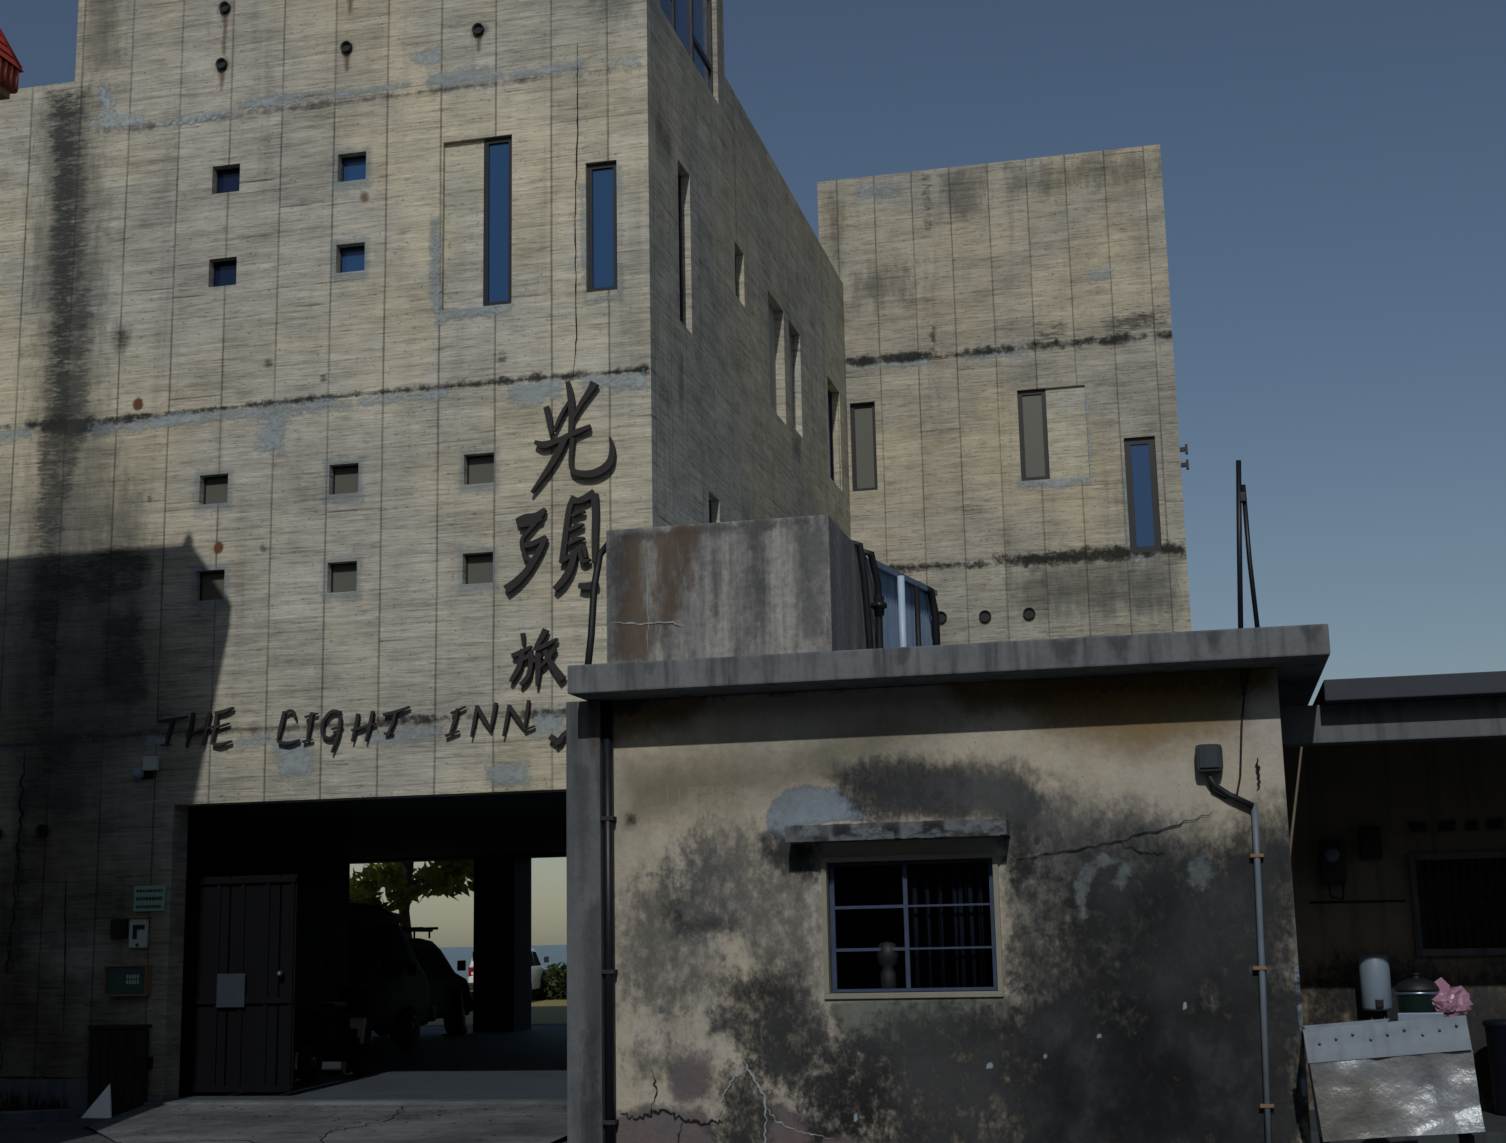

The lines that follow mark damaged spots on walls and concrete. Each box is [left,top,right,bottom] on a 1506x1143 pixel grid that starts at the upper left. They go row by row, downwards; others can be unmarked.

damp [0,91,447,714]
damp [582,373,646,390]
damp [236,734,313,779]
damp [363,723,441,747]
crack [374,714,445,726]
crack [522,709,566,718]
crack [1,744,33,974]
spalling [766,784,888,839]
crack [1012,810,1219,862]
damp [622,760,1506,1143]
crack [620,1060,833,1143]